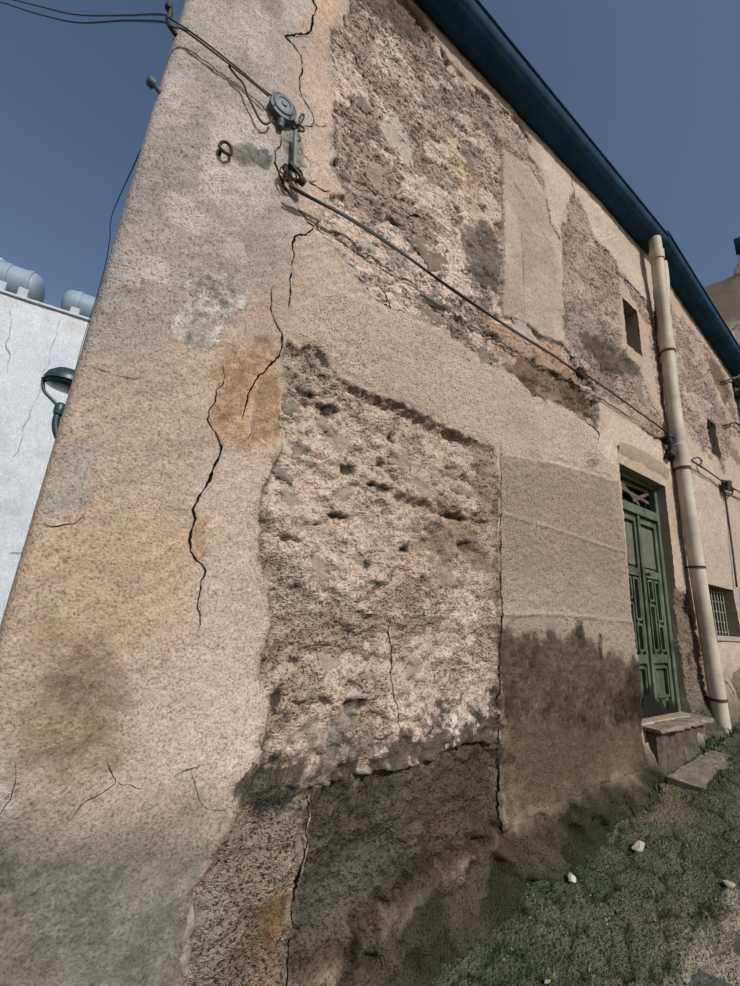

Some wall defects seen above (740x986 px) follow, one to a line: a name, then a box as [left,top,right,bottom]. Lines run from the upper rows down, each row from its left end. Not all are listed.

crack [175,0,326,633]
flaking render [314,0,669,446]
flaking render [670,305,740,475]
crack [286,790,311,986]
flaking render [179,339,502,986]
damp [233,618,643,986]
crack [495,452,504,834]